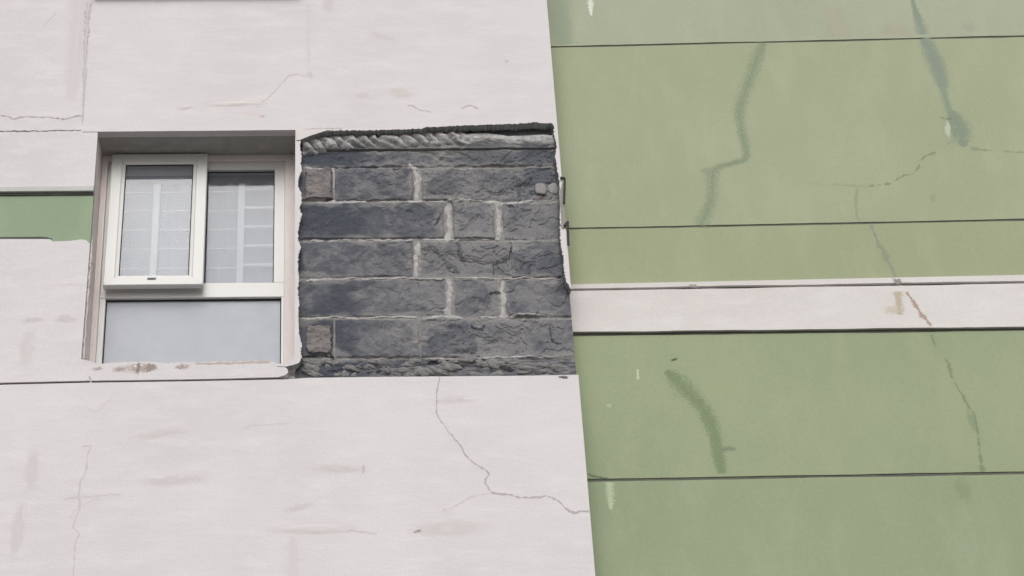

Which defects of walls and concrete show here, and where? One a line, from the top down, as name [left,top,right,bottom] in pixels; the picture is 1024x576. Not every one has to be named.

damp [693,42,769,228]
crack [814,117,1024,187]
damp [910,0,973,147]
rust [883,291,906,315]
crack [869,225,986,472]
crack [64,445,121,576]
crack [436,377,589,514]
damp [664,370,736,474]